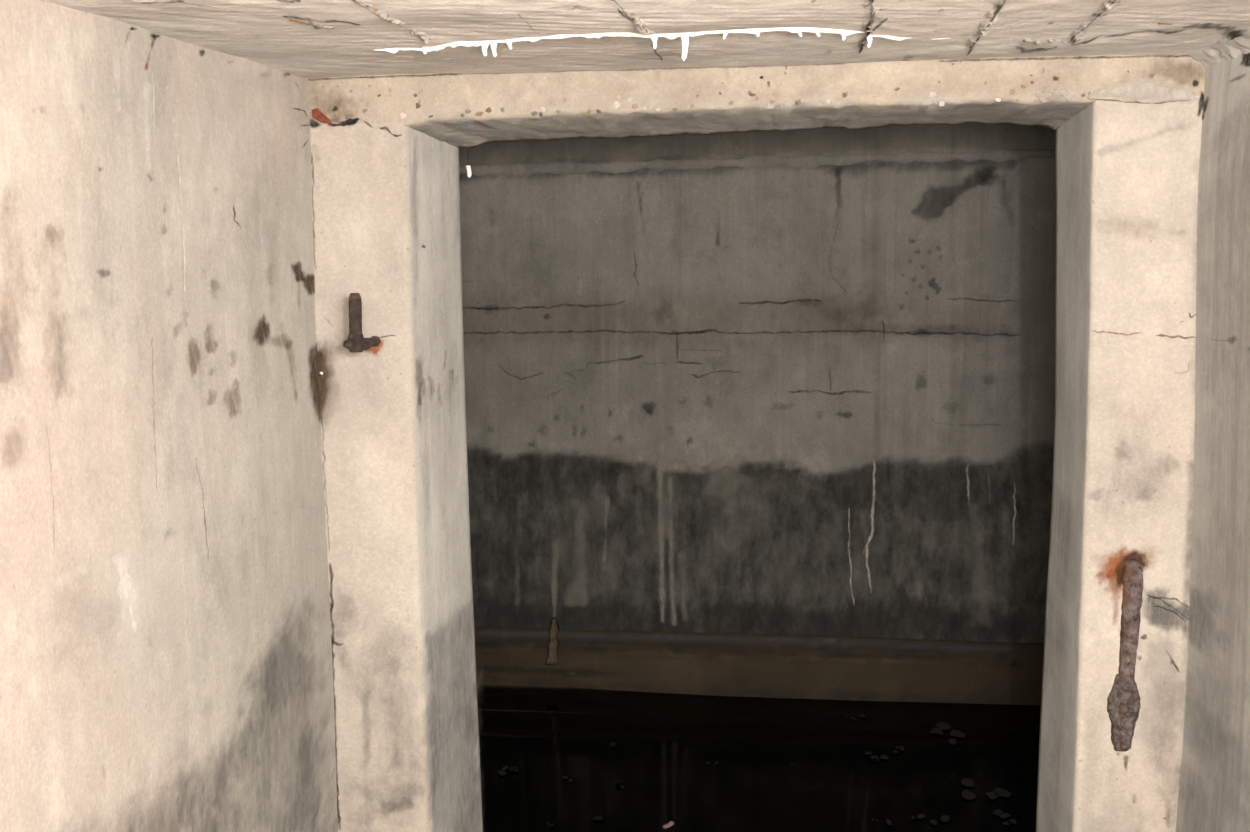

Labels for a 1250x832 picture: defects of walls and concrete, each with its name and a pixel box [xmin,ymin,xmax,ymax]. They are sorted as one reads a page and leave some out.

crack [352,0,431,44]
crack [612,0,663,70]
water stain [374,27,909,61]
crack [858,0,889,53]
crack [942,0,1243,62]
crack [308,72,458,80]
water stain [459,446,1054,665]
corrosion [1099,551,1145,590]